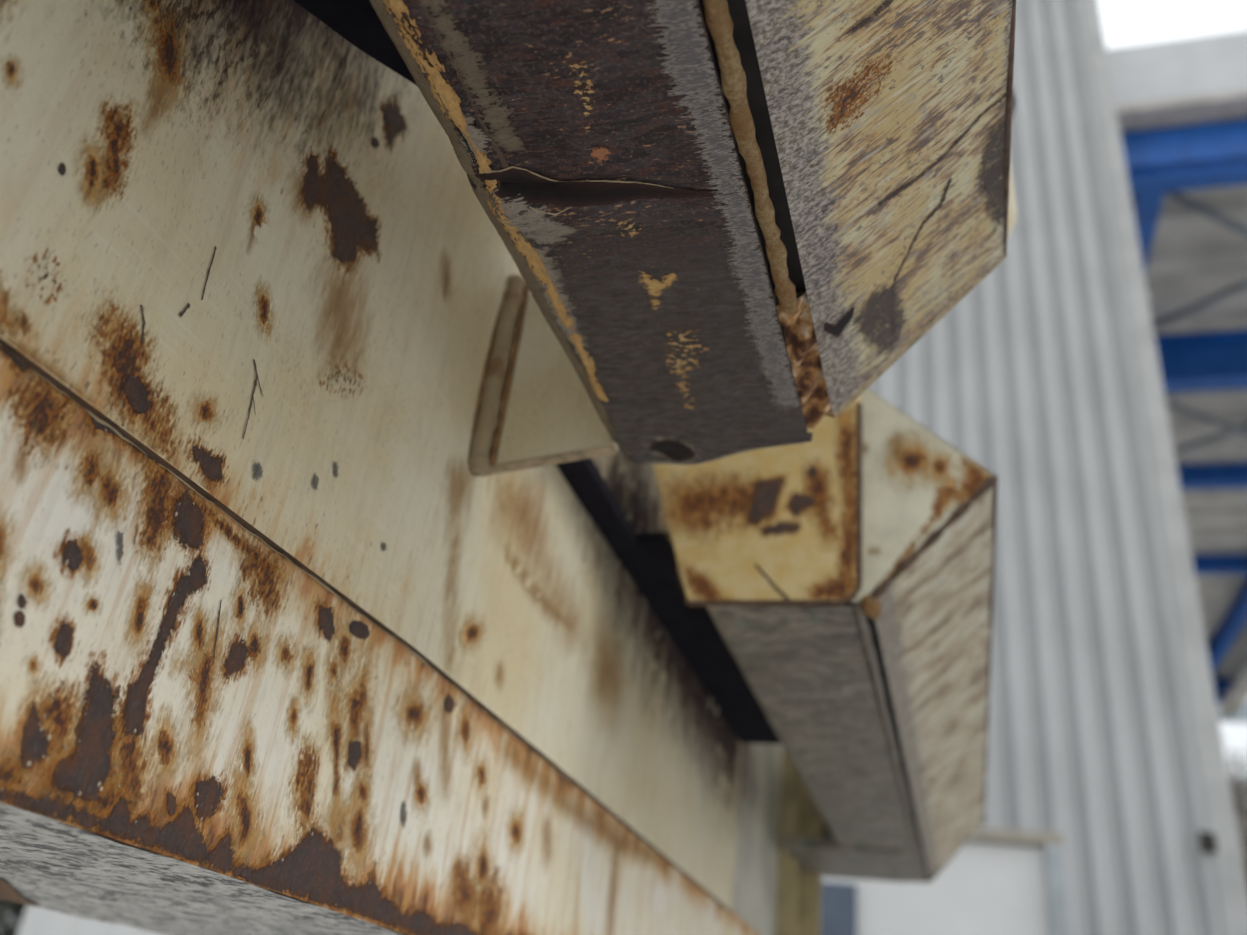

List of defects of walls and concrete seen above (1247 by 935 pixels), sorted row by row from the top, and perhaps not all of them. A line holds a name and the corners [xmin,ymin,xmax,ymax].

rust [77,102,137,209]
peeling [298,145,381,274]
peeling [369,0,620,433]
crack [447,113,737,216]
peeling [644,0,801,409]
rust [820,55,897,134]
rust [7,372,77,475]
rust [803,408,857,599]
rust [882,436,991,583]
rust [74,301,377,878]
rust [394,686,488,812]
rust [449,838,507,935]